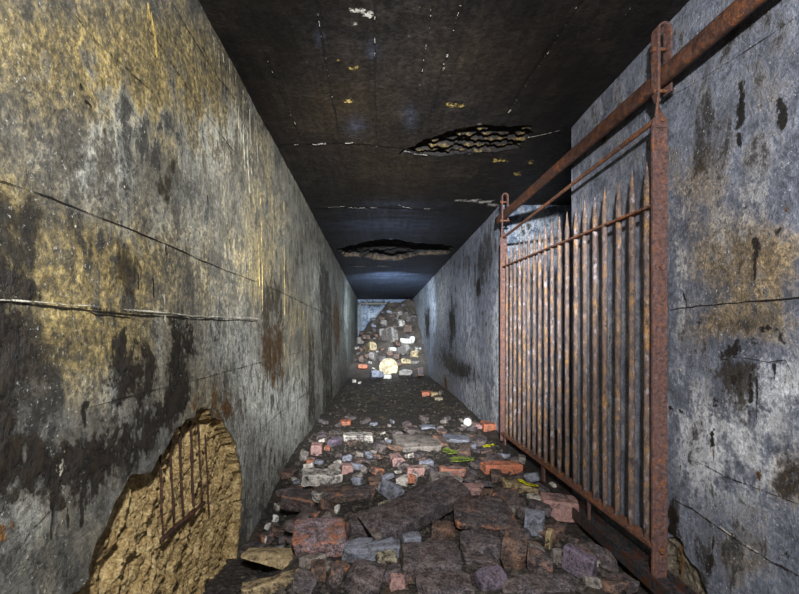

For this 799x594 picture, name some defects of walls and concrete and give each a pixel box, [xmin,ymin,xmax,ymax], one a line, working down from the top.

spalling [399,124,533,157]
leakage [735,80,746,146]
leakage [775,97,789,130]
crack [0,180,342,322]
spalling [337,239,456,261]
crack [671,293,799,311]
corrosion [257,322,286,395]
leakage [710,325,785,425]
leakage [80,401,90,427]
leakage [49,459,66,539]
leakage [66,491,84,528]
spalling [72,407,299,594]